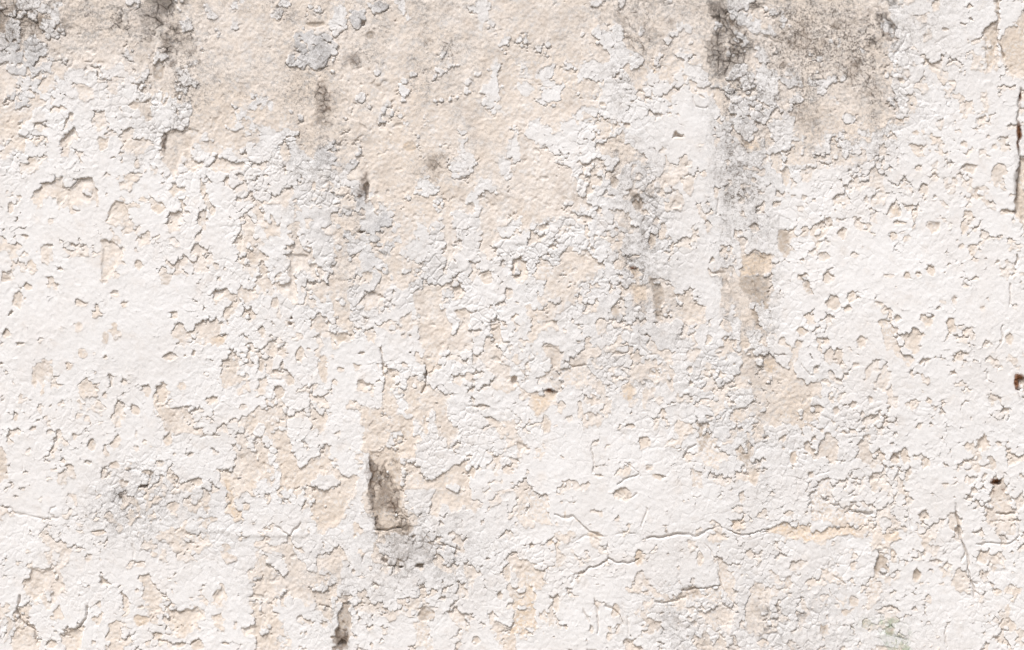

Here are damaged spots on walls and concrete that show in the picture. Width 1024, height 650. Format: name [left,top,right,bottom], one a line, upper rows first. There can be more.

leakage [708,10,753,73]
peeling [0,0,935,488]
peeling [931,157,1024,236]
peeling [875,302,941,367]
peeling [92,561,228,650]
peeling [119,326,483,576]
peeling [241,531,483,650]
peeling [487,477,553,529]
peeling [488,530,590,650]
crack [555,462,770,635]
peeling [769,359,972,594]
peeling [957,434,1024,583]